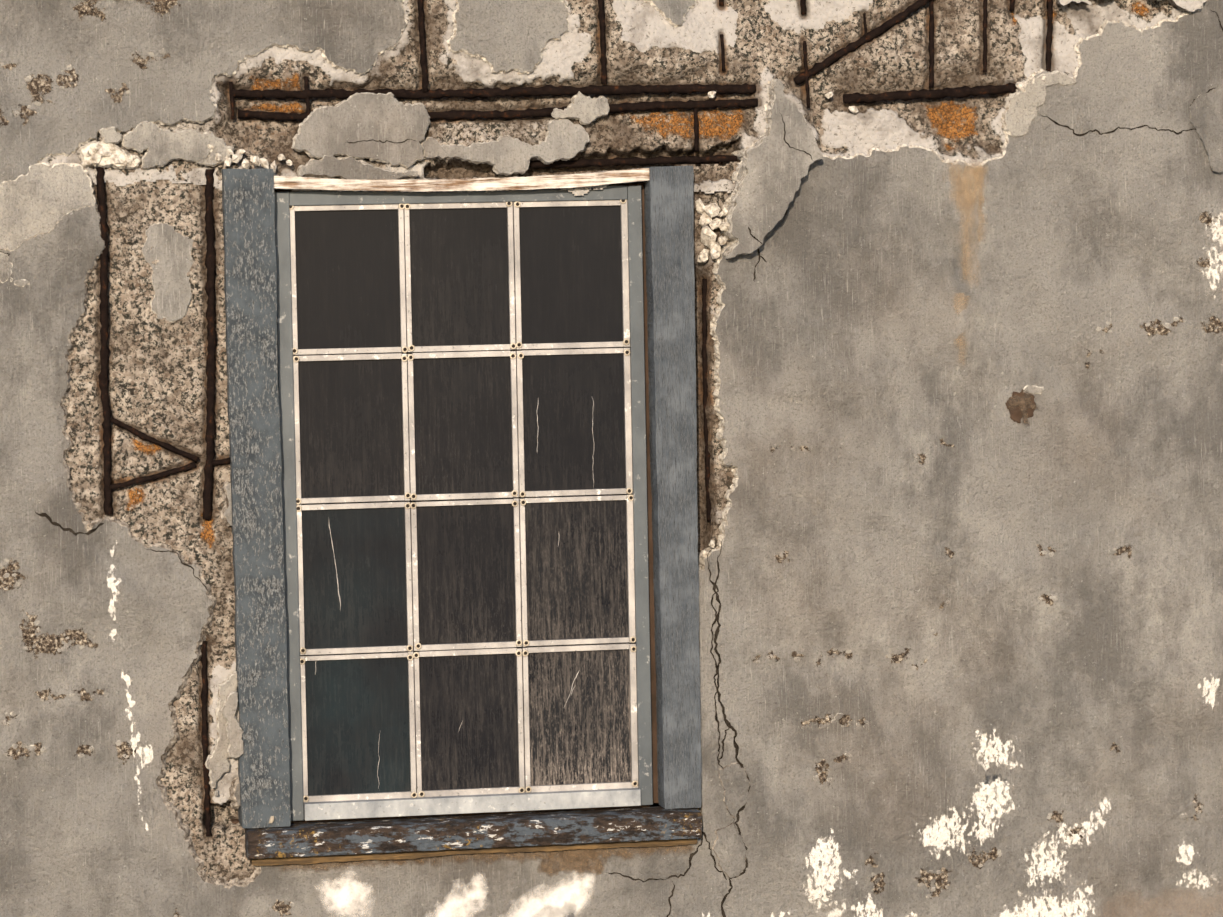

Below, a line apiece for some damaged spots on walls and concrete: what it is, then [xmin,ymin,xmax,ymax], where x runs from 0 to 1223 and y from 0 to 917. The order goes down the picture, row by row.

rust [251,73,304,113]
rust [621,108,744,140]
rust [927,99,978,150]
crack [1041,88,1215,136]
spalling [0,0,1207,571]
peeling [1201,316,1223,335]
rust [131,438,161,454]
rust [127,485,145,511]
spalling [60,143,261,889]
peeling [35,688,108,703]
crack [609,539,751,917]